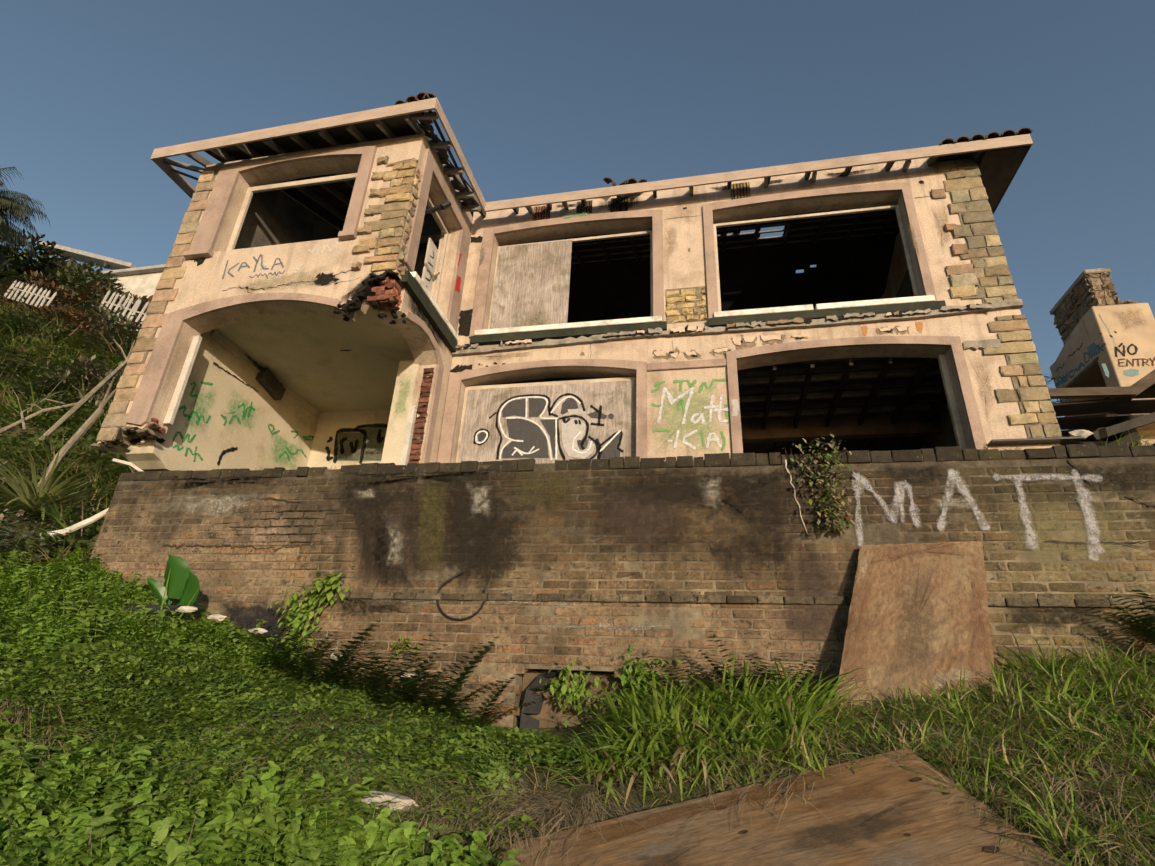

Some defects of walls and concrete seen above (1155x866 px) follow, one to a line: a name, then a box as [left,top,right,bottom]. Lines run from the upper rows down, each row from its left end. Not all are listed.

crack [223,270,360,293]
spalling [333,269,406,325]
spalling [603,286,812,360]
peeling [826,302,995,335]